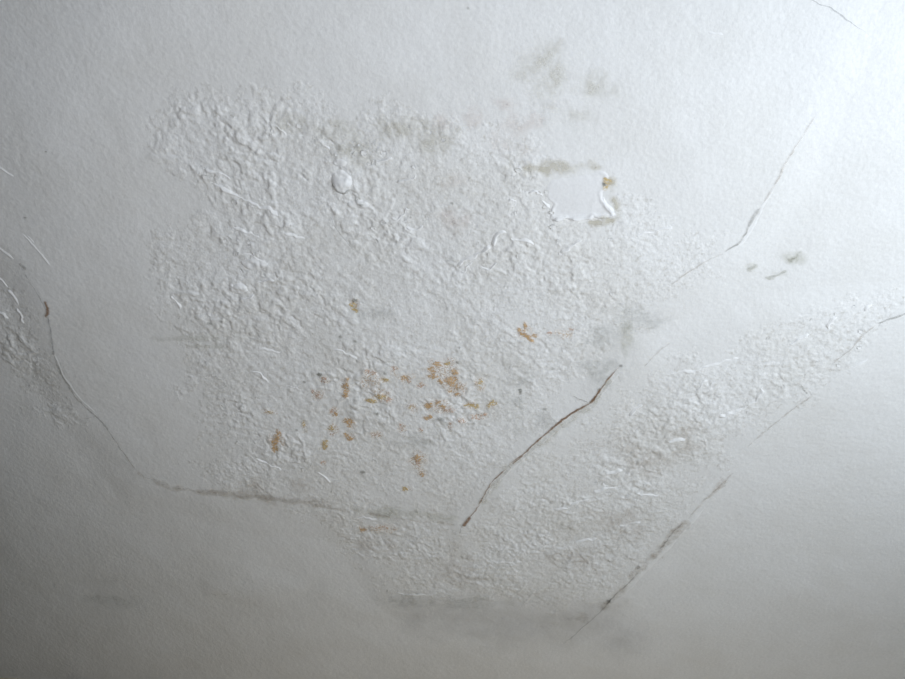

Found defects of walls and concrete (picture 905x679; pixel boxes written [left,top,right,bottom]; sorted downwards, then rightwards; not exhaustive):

rust [365,362,497,427]
crack [463,371,621,526]